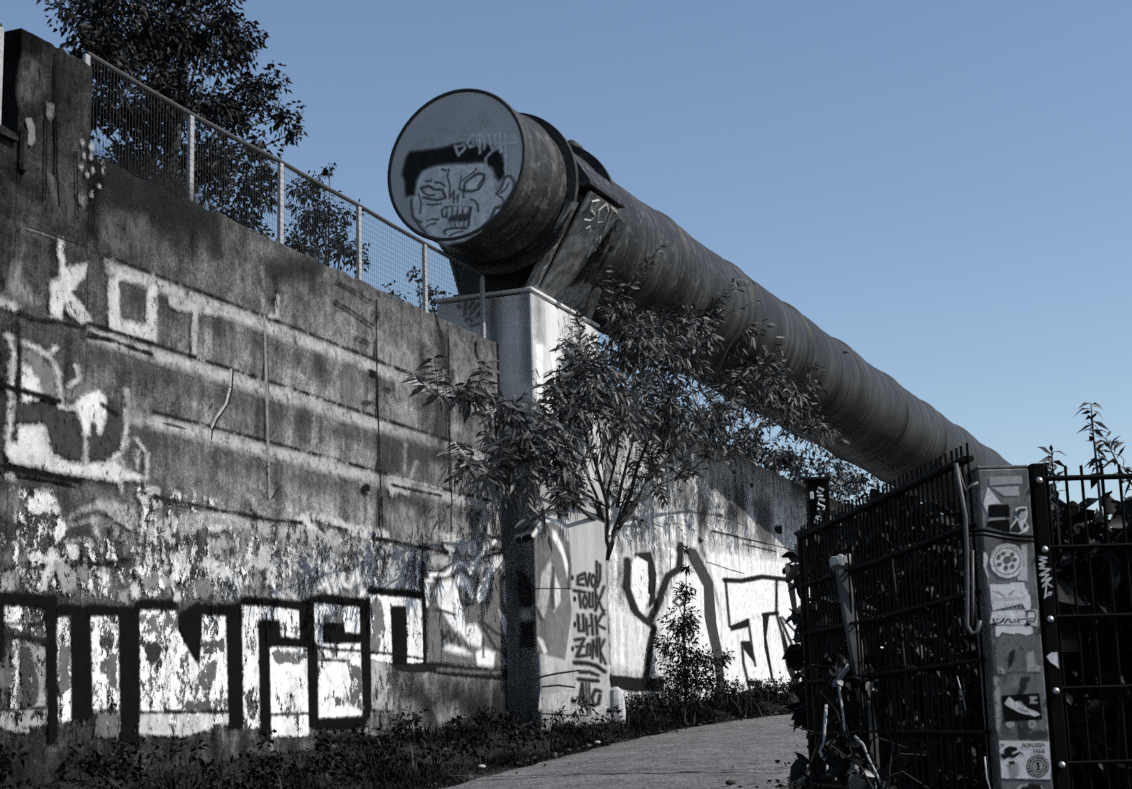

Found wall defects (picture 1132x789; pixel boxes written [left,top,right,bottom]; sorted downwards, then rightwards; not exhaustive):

spalling [100,402,492,502]
peeling [0,457,508,742]